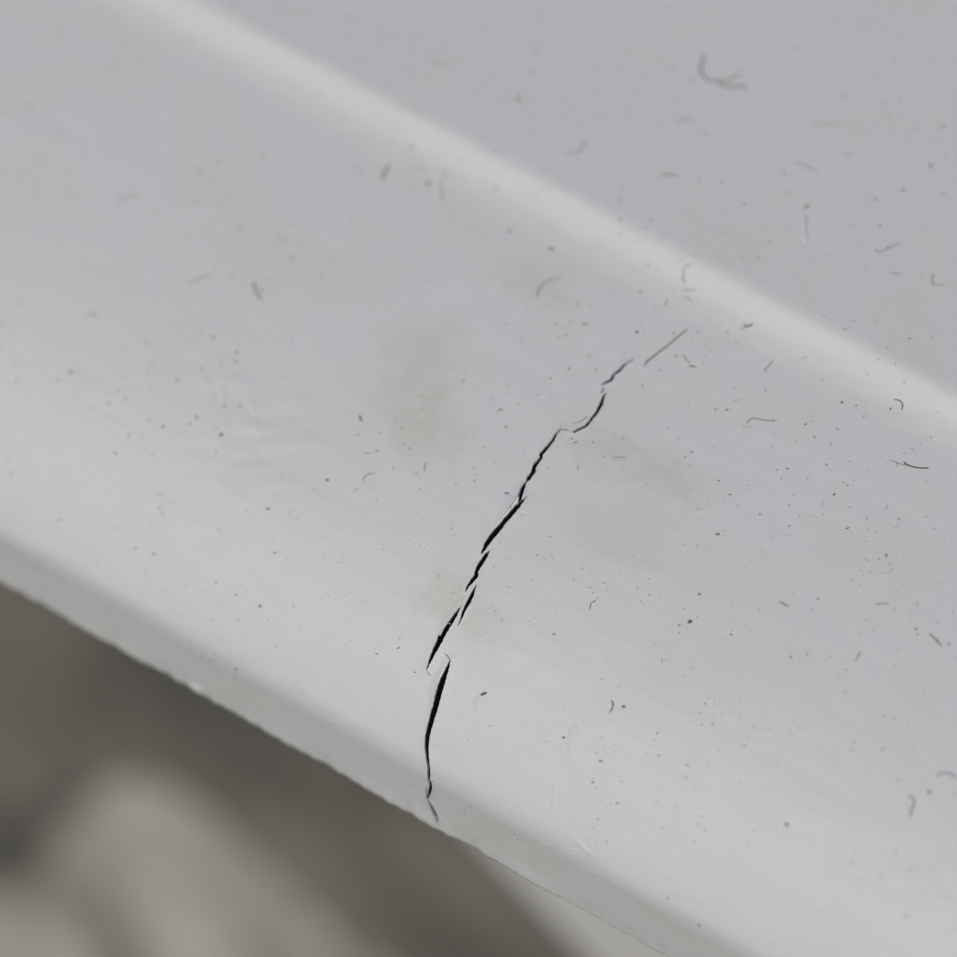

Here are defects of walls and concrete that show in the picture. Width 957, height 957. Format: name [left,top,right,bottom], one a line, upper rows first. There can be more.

crack [425,329,687,821]